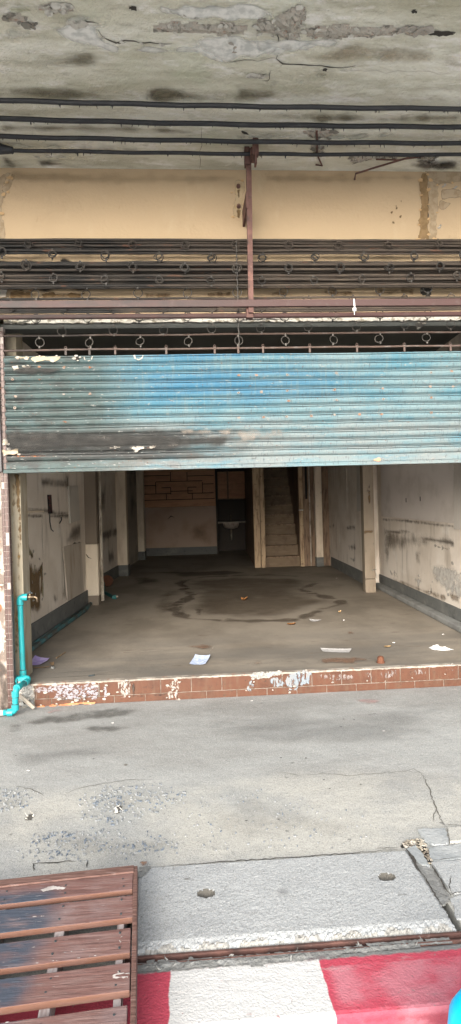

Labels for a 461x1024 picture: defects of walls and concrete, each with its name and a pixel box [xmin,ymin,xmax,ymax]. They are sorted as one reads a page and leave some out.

spalling [2,2,74,30]
spalling [153,5,456,41]
peeling [348,156,461,239]
damp [12,474,43,611]
peeling [18,679,131,708]
peeling [245,669,353,701]
crack [325,768,443,823]